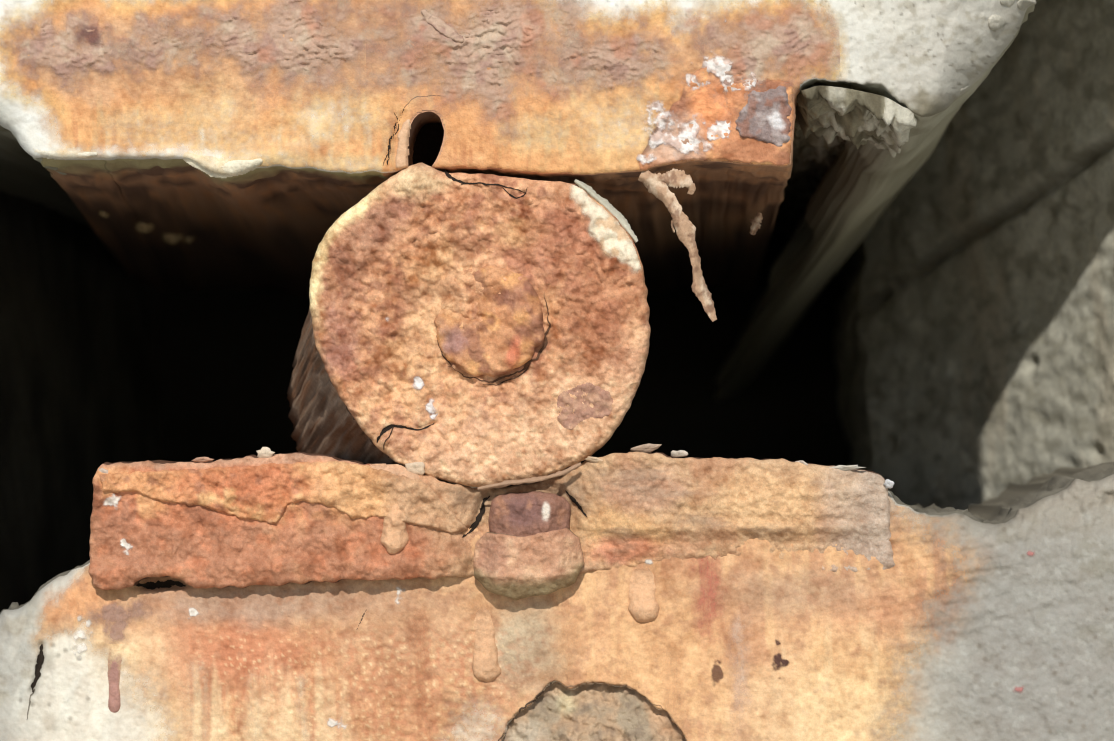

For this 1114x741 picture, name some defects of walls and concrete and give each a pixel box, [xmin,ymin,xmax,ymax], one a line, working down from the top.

rust [0,0,841,174]
peeling [637,56,917,322]
rust [99,447,480,557]
rust [630,443,688,458]
rust [35,506,967,741]
crack [27,644,44,719]
spalling [498,681,686,741]